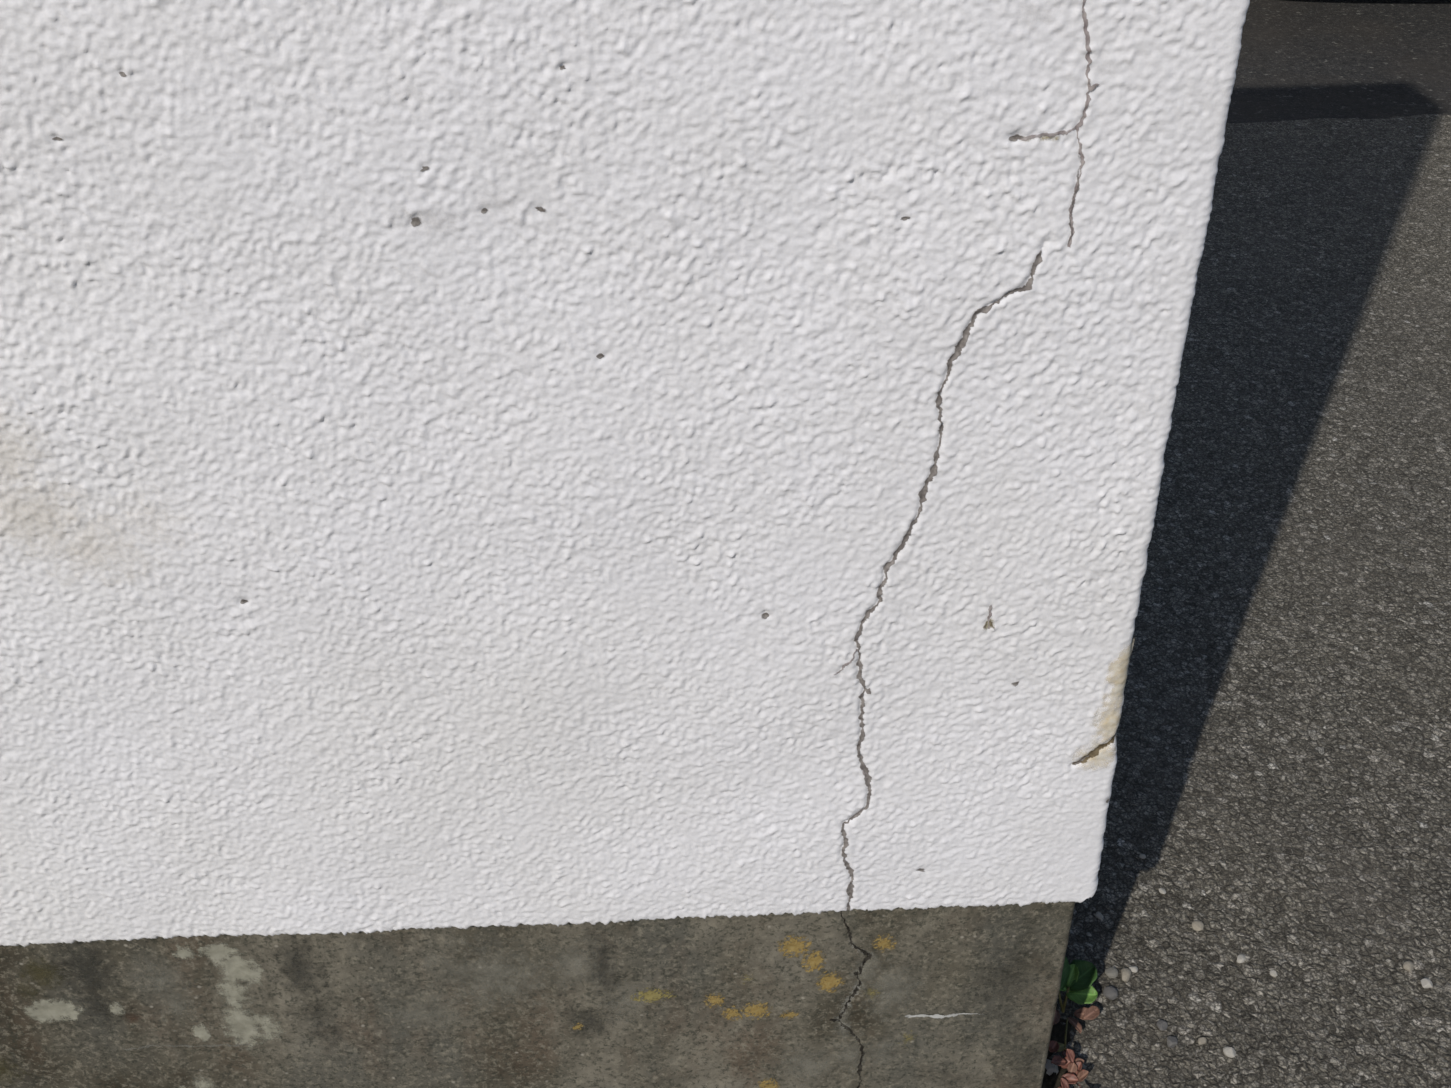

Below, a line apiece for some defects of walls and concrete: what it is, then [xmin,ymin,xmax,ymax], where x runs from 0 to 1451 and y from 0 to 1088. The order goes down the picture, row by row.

crack [830,0,1099,1088]
crack [1072,735,1115,765]